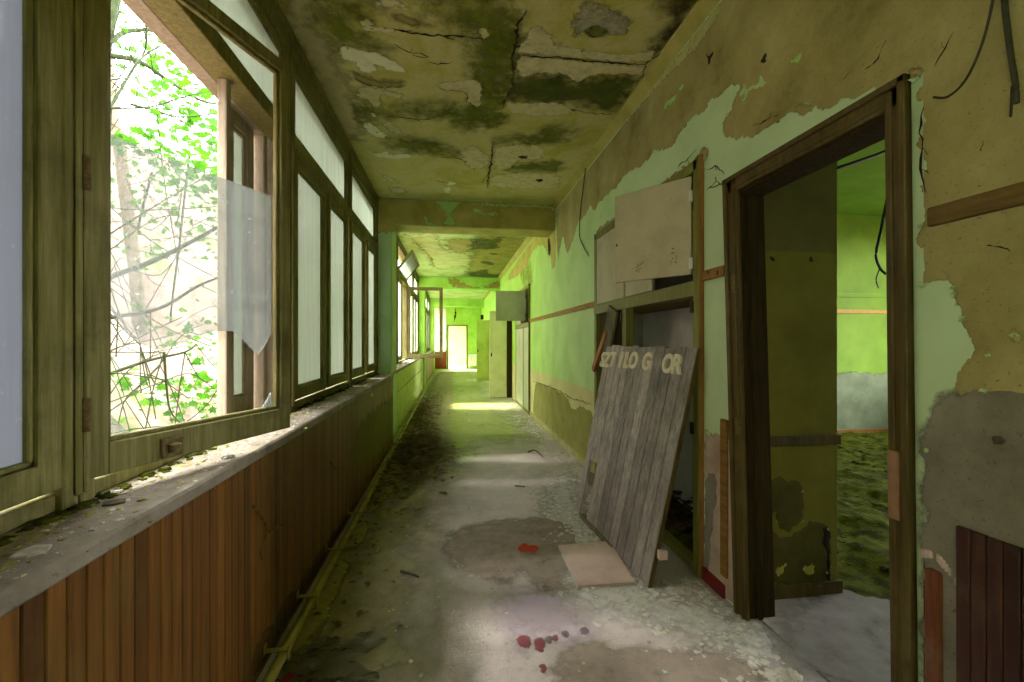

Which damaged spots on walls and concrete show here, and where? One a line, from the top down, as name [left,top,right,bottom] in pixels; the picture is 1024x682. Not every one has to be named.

peeling [339,46,406,73]
peeling [356,86,403,138]
damp [385,136,460,156]
damp [278,0,642,140]
crack [439,145,494,185]
crack [370,10,661,109]
damp [510,160,563,172]
peeling [378,0,1024,395]
peeling [533,382,594,466]
damp [253,371,538,682]
damp [443,472,891,682]
peeling [771,477,834,587]